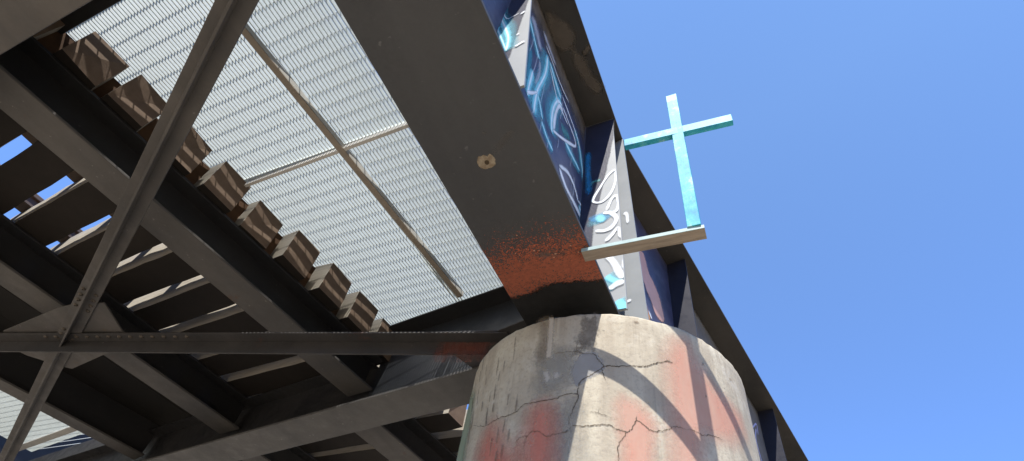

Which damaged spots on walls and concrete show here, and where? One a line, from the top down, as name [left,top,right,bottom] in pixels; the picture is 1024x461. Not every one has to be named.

crack [475,345,719,460]